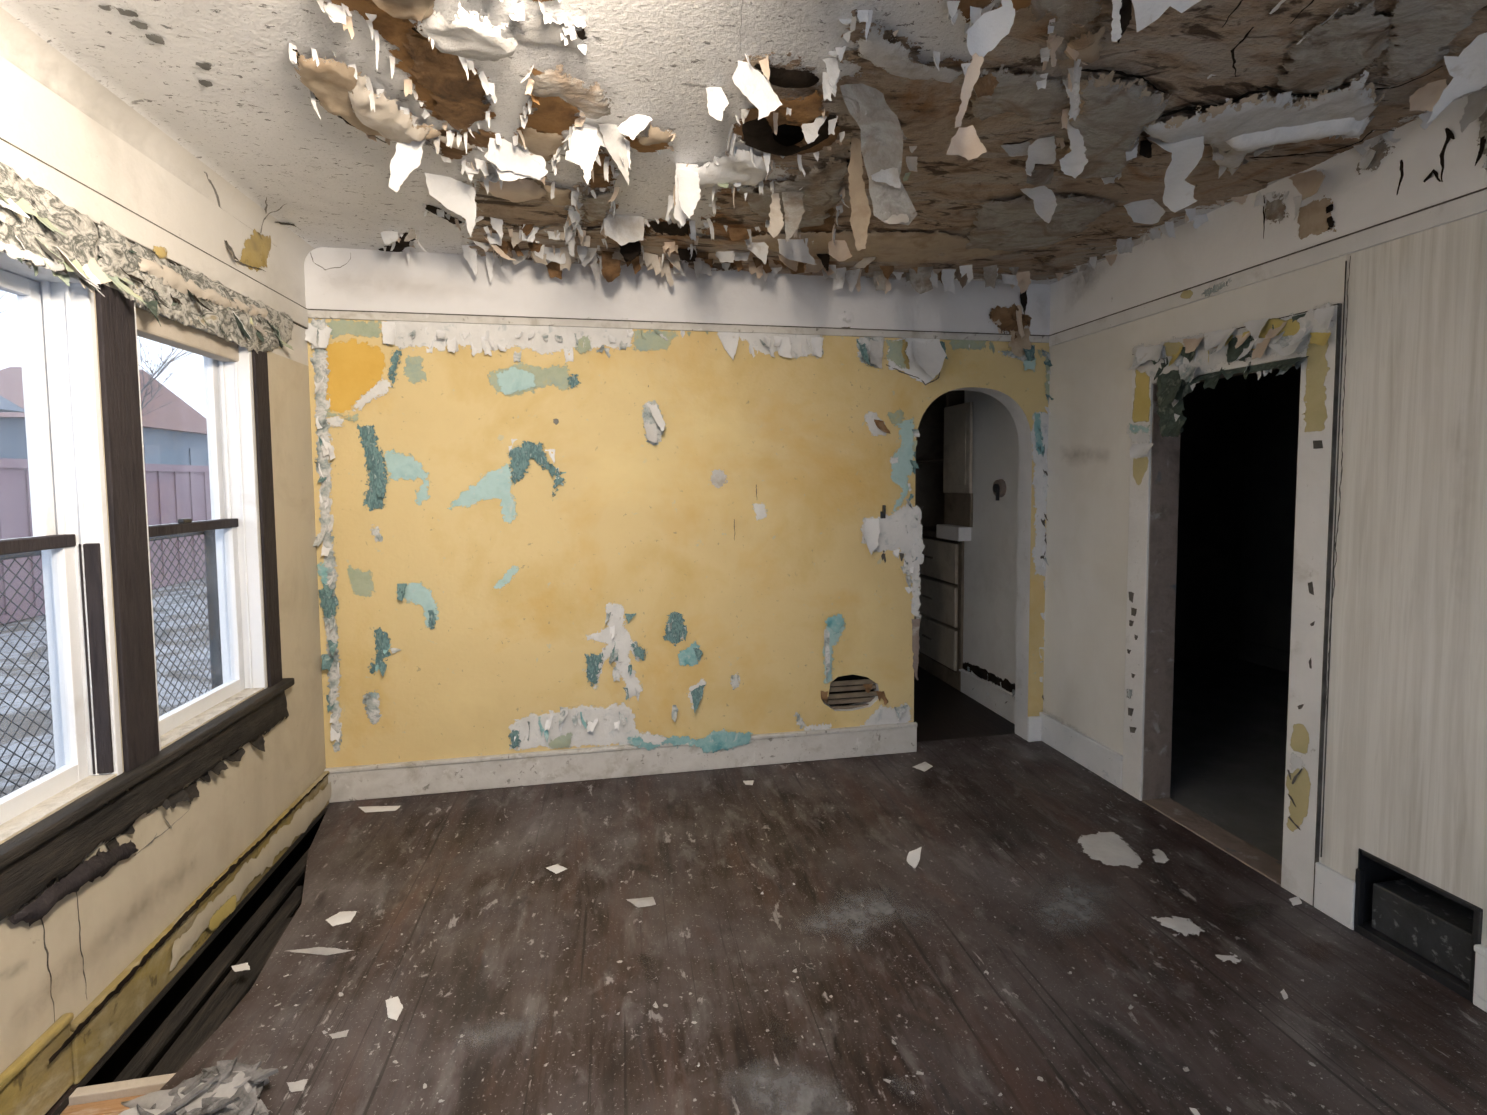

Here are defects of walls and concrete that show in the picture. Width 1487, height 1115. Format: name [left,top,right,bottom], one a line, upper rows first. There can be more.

spalling [99,5,165,45]
spalling [196,62,213,87]
peeling [316,0,1487,591]
peeling [0,162,824,754]
flaking render [860,409,925,680]
spalling [794,614,911,731]
peeling [963,662,1015,703]
spalling [1127,592,1138,654]
peeling [156,734,265,810]
peeling [1286,704,1311,832]
crack [49,773,328,1064]
peeling [170,782,332,971]